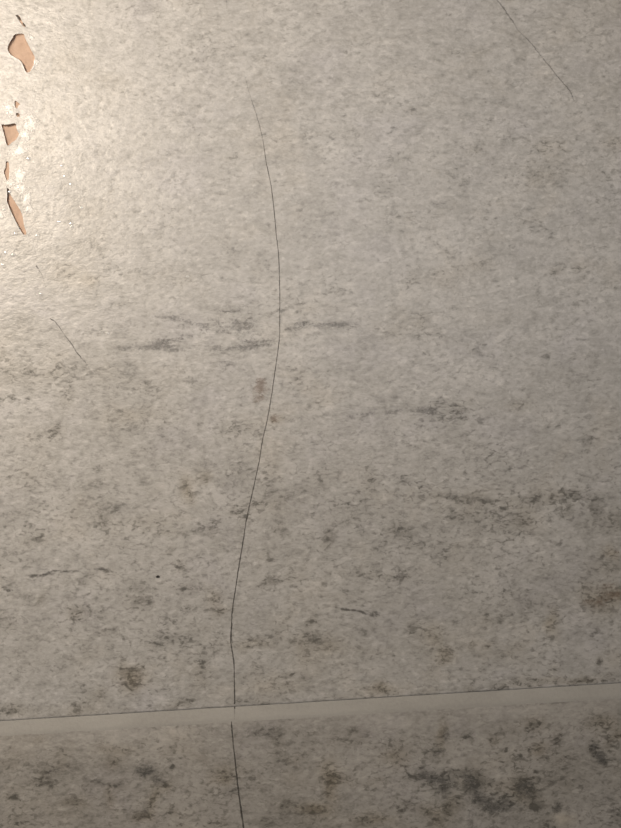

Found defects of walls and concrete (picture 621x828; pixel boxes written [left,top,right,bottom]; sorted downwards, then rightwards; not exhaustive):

spalling [6,15,39,74]
spalling [0,101,37,235]
crack [230,155,280,828]